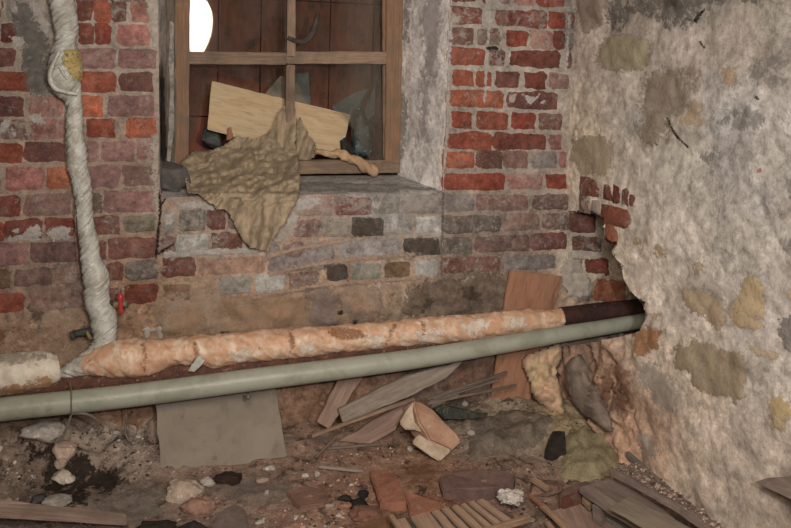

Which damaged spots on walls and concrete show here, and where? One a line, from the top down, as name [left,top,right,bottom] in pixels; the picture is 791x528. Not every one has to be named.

peeling [8,35,25,47]
peeling [560,250,604,298]